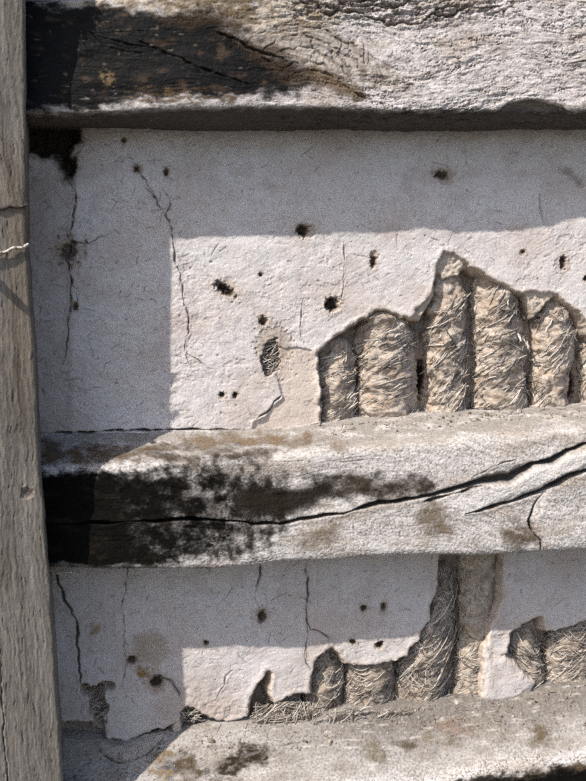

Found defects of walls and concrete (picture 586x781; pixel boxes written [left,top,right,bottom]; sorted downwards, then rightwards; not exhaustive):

leakage [25,0,369,113]
crack [318,70,383,103]
crack [63,175,113,364]
crack [128,156,214,369]
spalling [250,250,586,429]
crack [42,426,240,434]
leakage [41,432,451,568]
crack [228,442,586,551]
crack [52,566,168,777]
spalling [62,647,411,741]
spalling [438,554,458,689]
spalling [477,554,535,699]